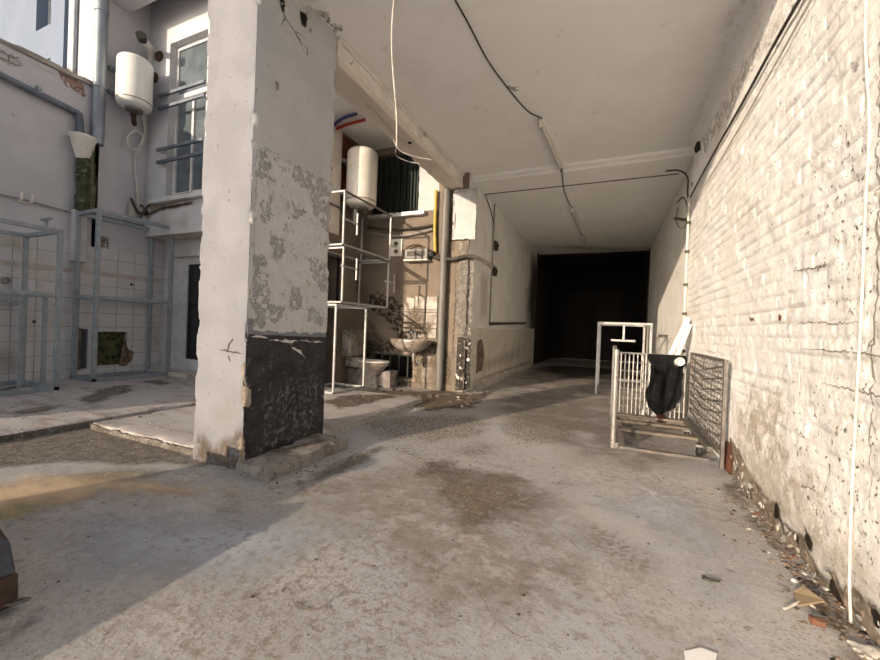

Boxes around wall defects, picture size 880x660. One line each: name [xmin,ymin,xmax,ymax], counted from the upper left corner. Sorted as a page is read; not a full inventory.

crack [282,11,308,56]
peeling [0,50,22,67]
flaking render [59,67,85,97]
peeling [236,147,332,355]
crack [866,41,880,508]
flaking render [455,258,485,390]
spalling [241,362,252,408]
spalling [237,436,246,462]